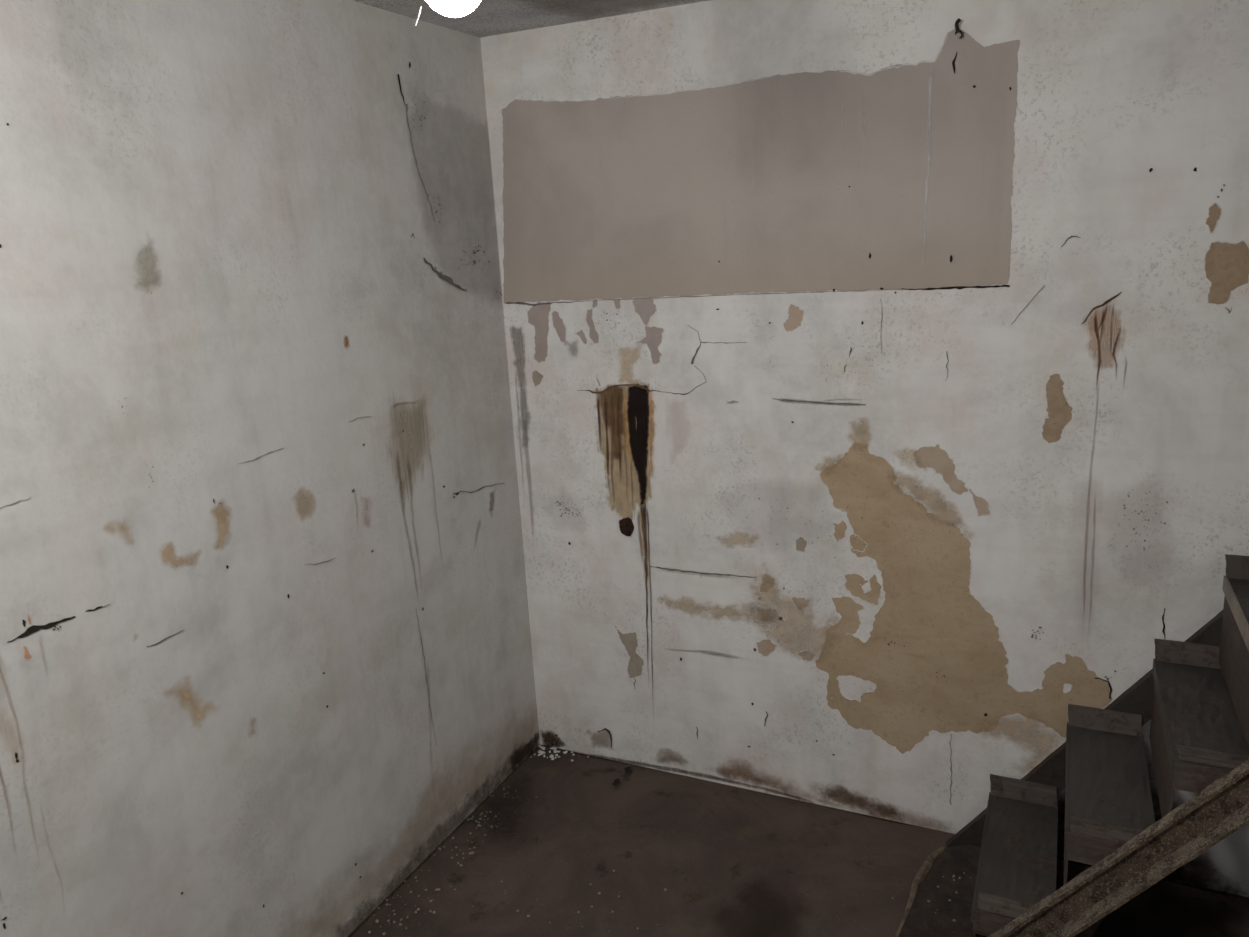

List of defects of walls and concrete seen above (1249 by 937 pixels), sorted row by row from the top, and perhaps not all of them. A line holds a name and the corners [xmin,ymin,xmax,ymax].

flaking render [397,62,443,223]
flaking render [424,29,1020,387]
peeling [1204,184,1249,313]
crack [577,325,747,395]
peeling [1042,373,1073,443]
rust [1082,292,1126,380]
crack [7,604,110,658]
rust [596,384,654,685]
peeling [754,639,777,657]
peeling [797,423,1112,754]